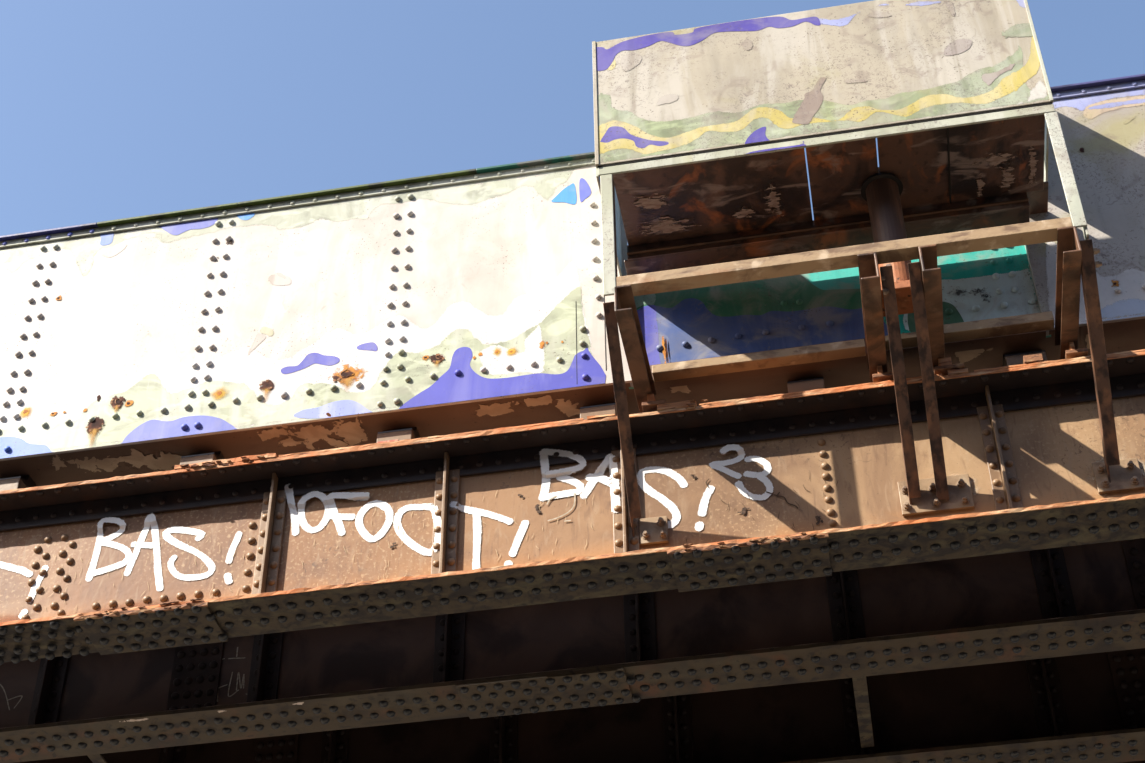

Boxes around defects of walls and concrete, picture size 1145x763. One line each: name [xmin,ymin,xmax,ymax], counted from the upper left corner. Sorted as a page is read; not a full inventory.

rust [422,353,445,364]
rust [332,364,364,386]
rust [259,379,274,395]
peeling [475,395,580,417]
rust [83,395,133,442]
peeling [257,412,368,451]
rust [180,455,264,470]
rust [76,598,203,620]